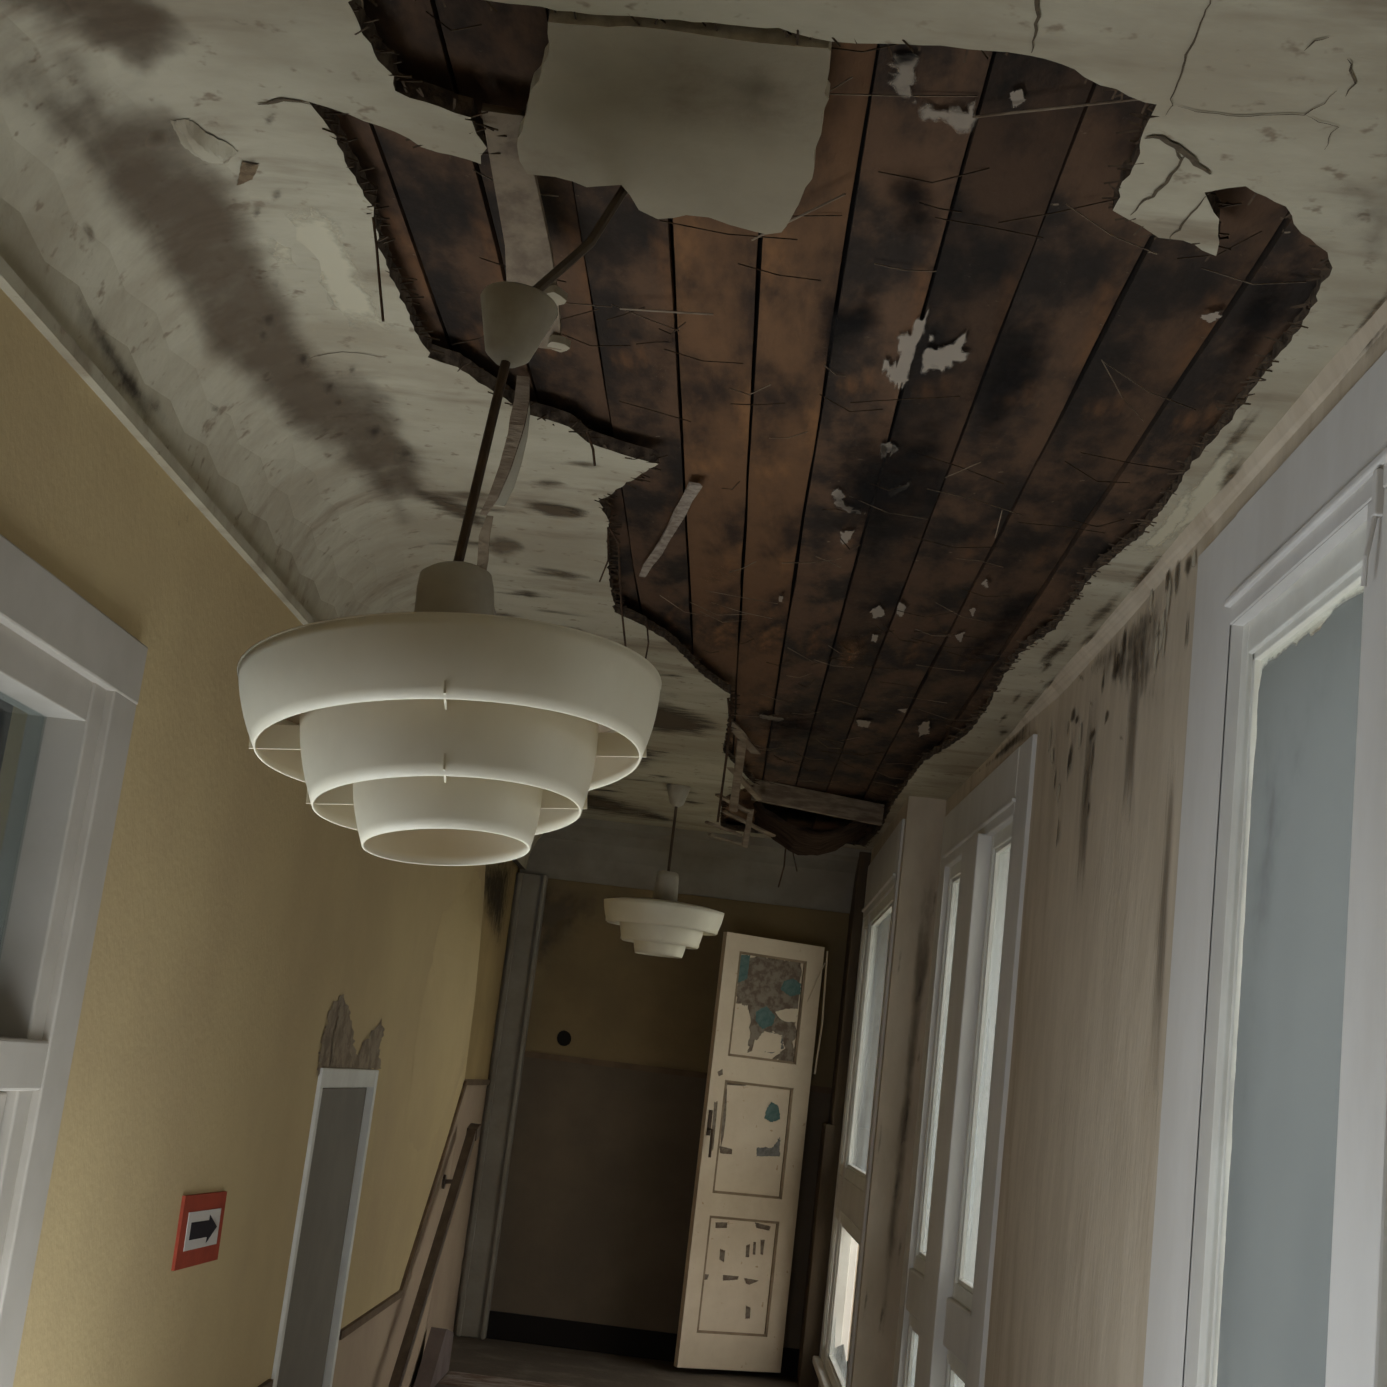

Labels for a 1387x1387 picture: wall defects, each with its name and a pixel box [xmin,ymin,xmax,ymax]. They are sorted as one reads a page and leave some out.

leakage [27,0,167,61]
crack [1031,0,1041,53]
crack [1131,0,1357,237]
flaking render [275,212,381,321]
leakage [61,101,494,525]
spalling [316,0,1330,856]
leakage [528,504,580,517]
leakage [653,704,715,734]
leakage [587,789,666,820]
leakage [484,863,508,929]
spalling [317,994,385,1077]
peeling [731,955,802,1062]